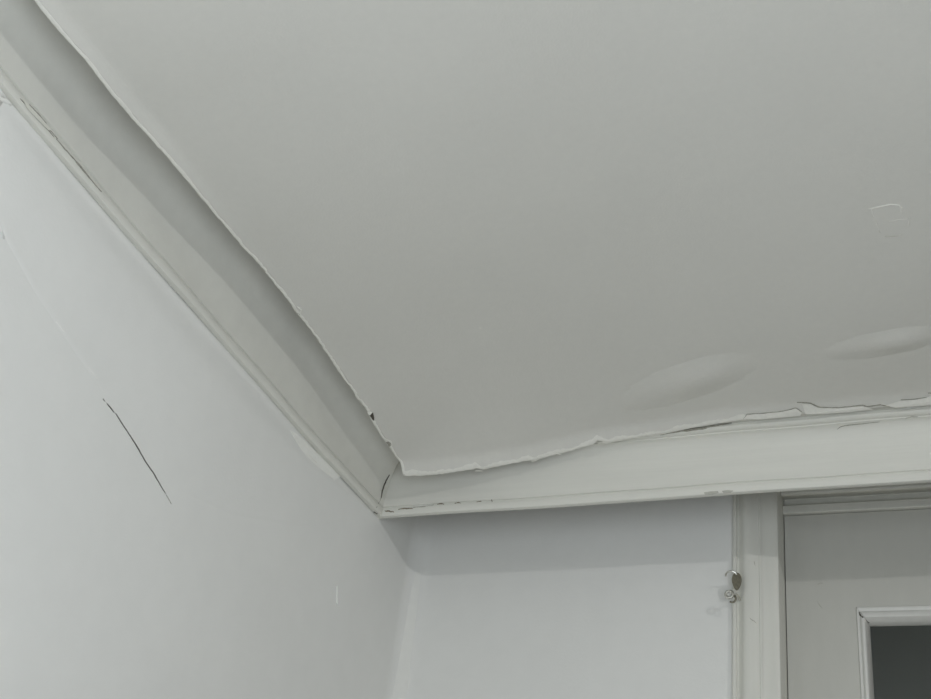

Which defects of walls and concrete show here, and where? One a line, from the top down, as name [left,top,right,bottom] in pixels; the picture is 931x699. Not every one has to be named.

crack [103,399,171,503]
peeling [743,393,931,419]